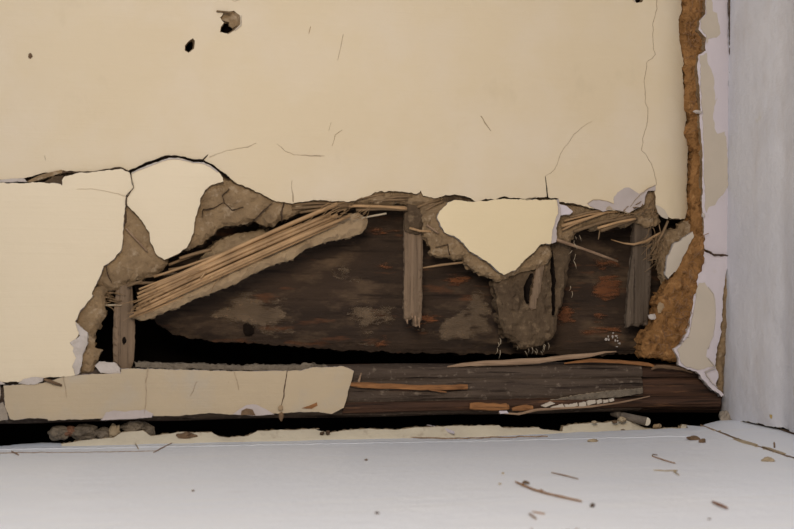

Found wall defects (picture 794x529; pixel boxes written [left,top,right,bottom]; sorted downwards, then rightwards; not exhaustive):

crack [0,143,256,205]
spalling [181,0,728,393]
crack [641,0,657,185]
spalling [70,205,169,375]
peeling [541,388,643,408]
crack [700,421,794,458]